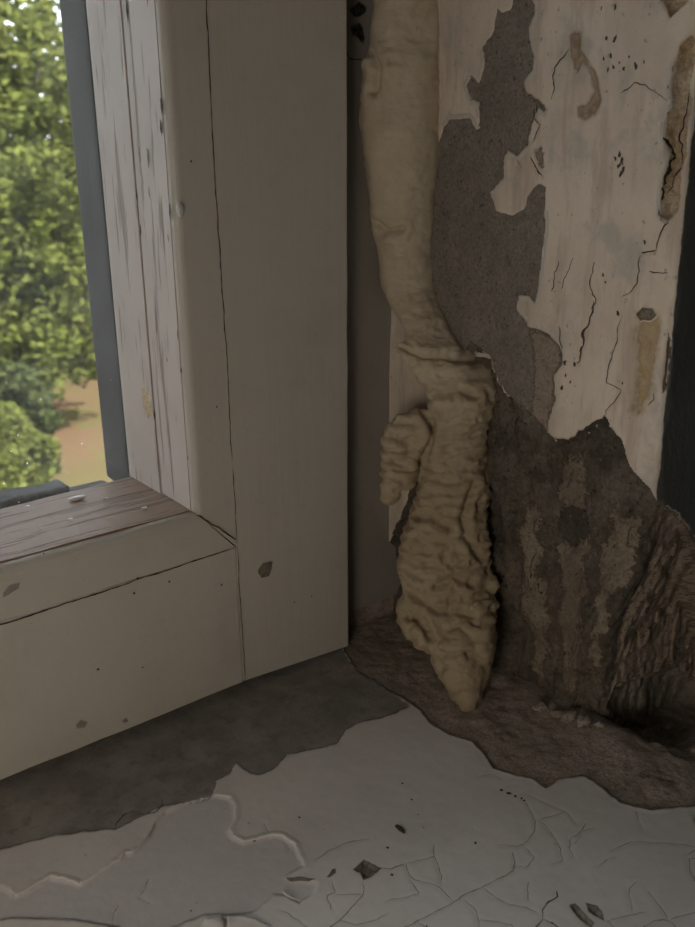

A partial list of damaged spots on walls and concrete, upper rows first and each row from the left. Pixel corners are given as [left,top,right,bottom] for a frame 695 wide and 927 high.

crack [519,49,569,175]
crack [623,222,669,296]
flaking render [430,0,695,732]
crack [605,320,621,414]
peeling [258,561,273,578]
flaking render [390,481,418,561]
peeling [0,583,695,927]
crack [327,793,592,927]